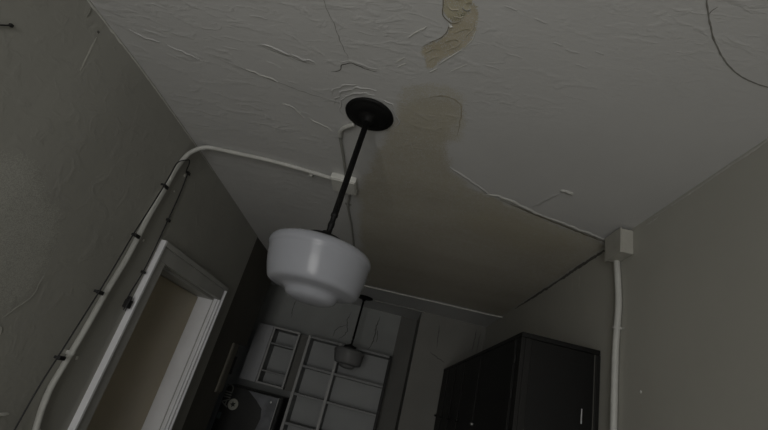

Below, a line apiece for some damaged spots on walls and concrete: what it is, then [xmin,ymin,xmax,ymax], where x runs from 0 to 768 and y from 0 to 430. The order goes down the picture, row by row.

flaking render [421,0,479,72]
crack [706,0,768,88]
damp [353,81,605,316]